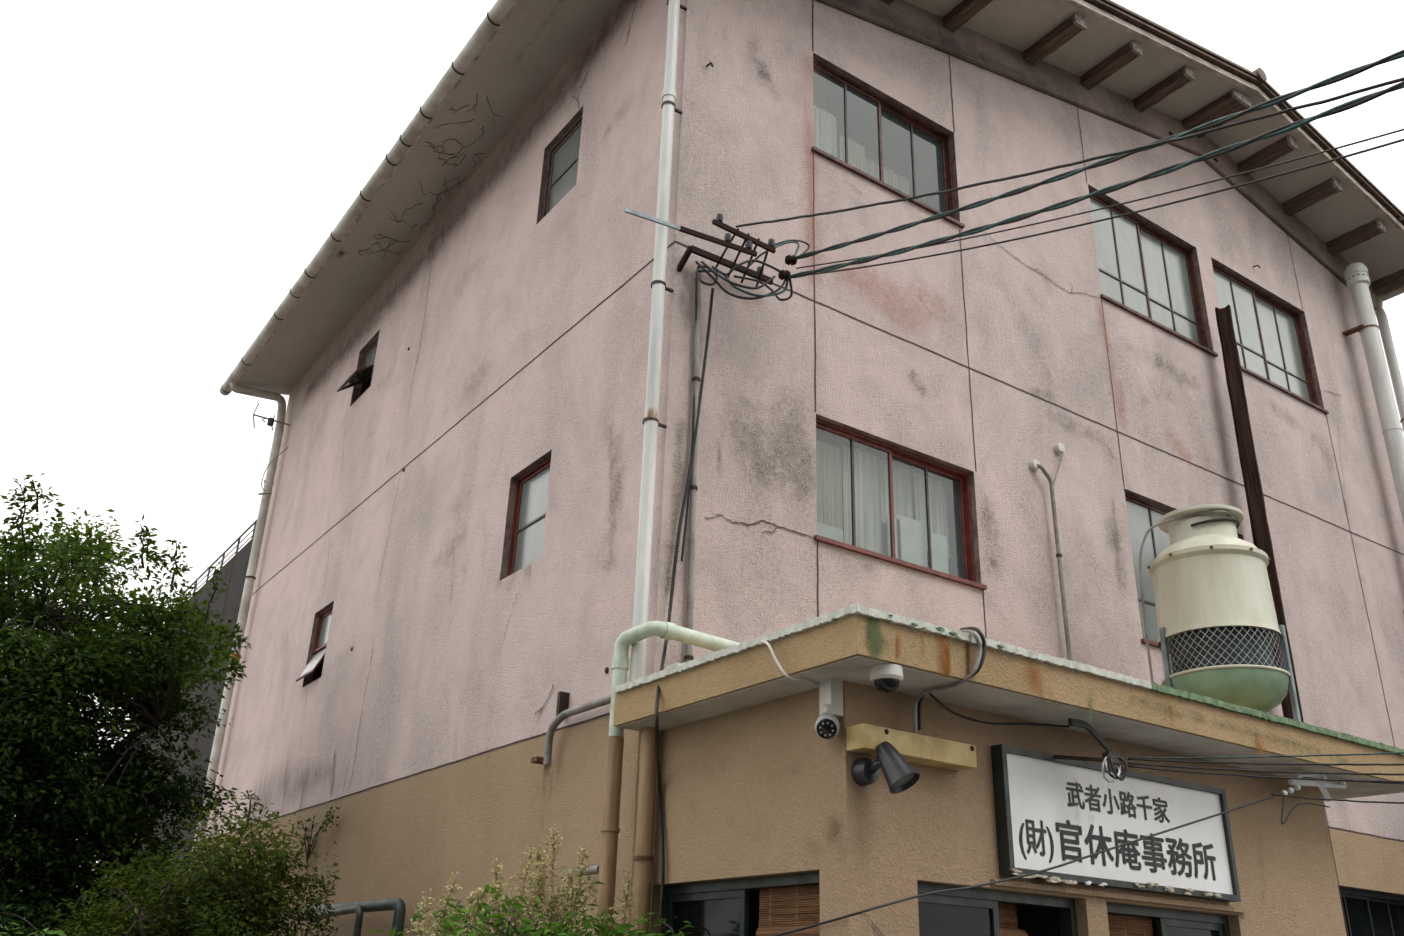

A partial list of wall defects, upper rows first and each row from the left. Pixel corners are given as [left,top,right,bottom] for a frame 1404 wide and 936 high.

crack [985,232,1099,298]
crack [705,514,814,539]